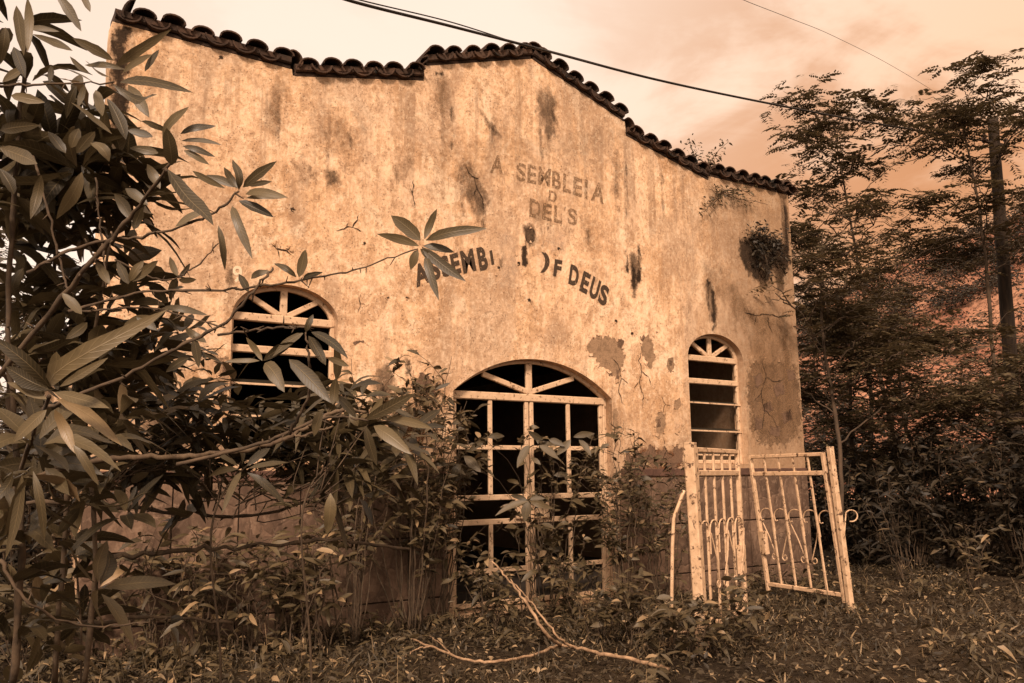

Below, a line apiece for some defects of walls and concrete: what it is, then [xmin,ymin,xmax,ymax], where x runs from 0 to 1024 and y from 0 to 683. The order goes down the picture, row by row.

leakage [538,92,557,139]
leakage [465,167,489,227]
leakage [739,199,792,290]
leakage [625,247,641,295]
leakage [707,279,717,331]
peeling [587,331,674,383]
spalling [746,357,803,449]